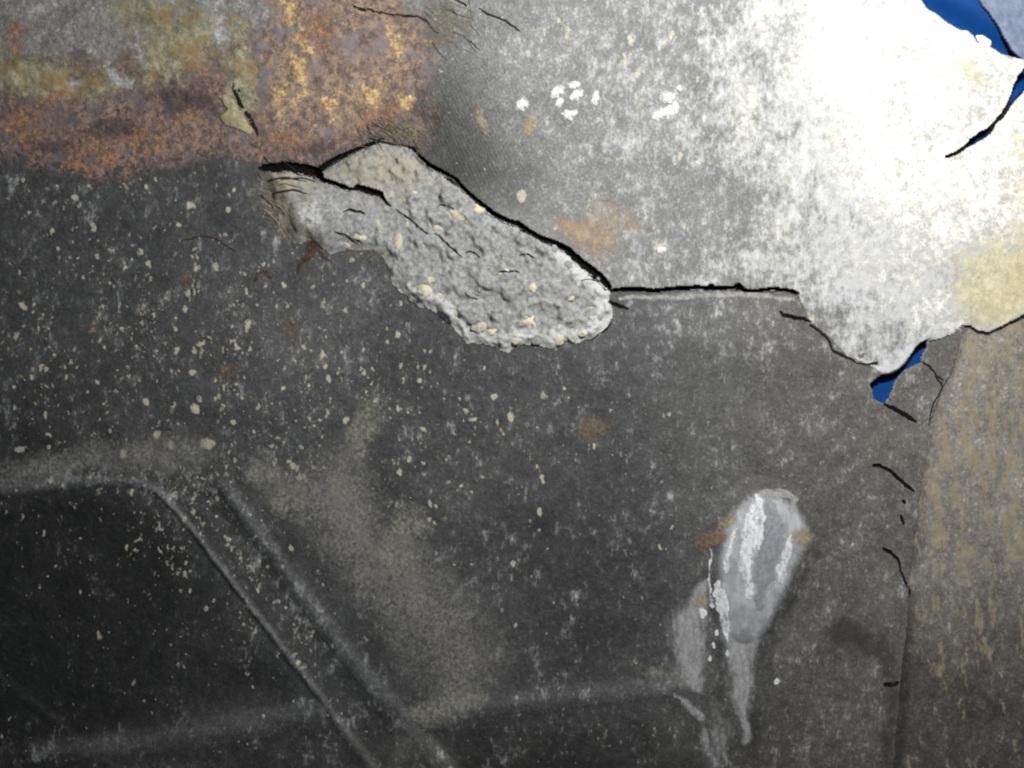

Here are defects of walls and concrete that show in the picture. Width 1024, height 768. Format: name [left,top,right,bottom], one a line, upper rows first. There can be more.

peeling [975,35,991,46]
rust [0,0,439,181]
crack [219,83,878,365]
crack [883,361,944,424]
water stain [759,489,798,513]
crack [872,463,915,525]
crack [882,547,911,595]
water stain [650,580,726,767]
water stain [728,634,754,743]
crack [883,680,902,688]